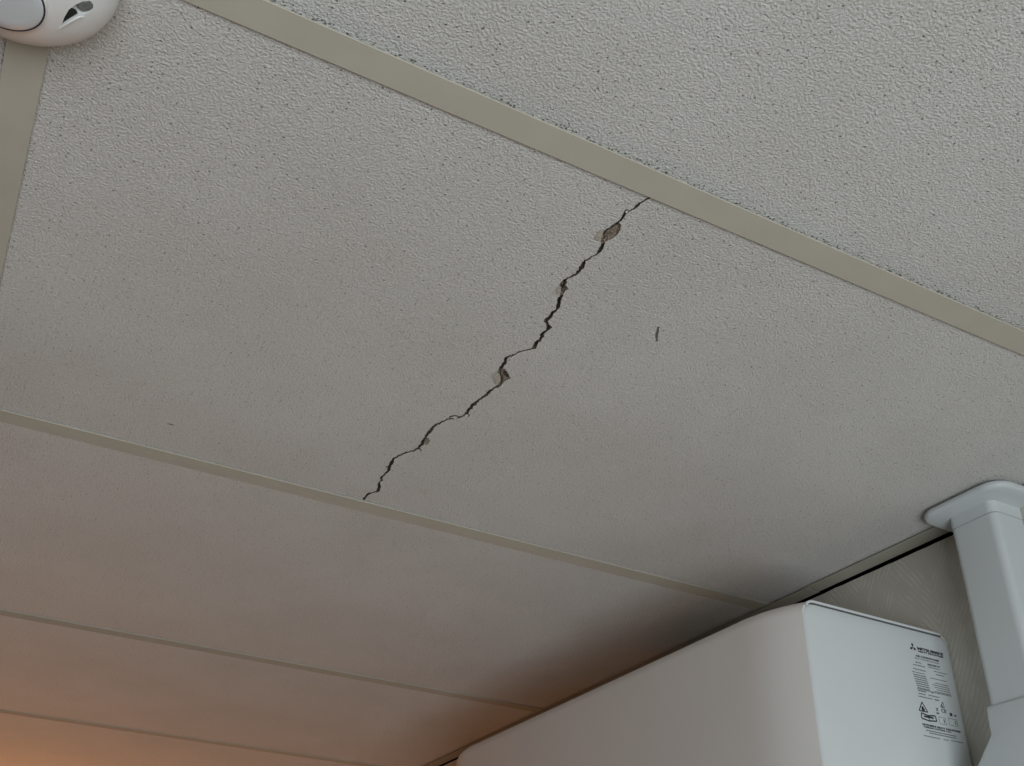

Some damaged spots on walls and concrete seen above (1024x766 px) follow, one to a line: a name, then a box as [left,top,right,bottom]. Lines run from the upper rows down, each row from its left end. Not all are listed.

crack [363,197,650,500]